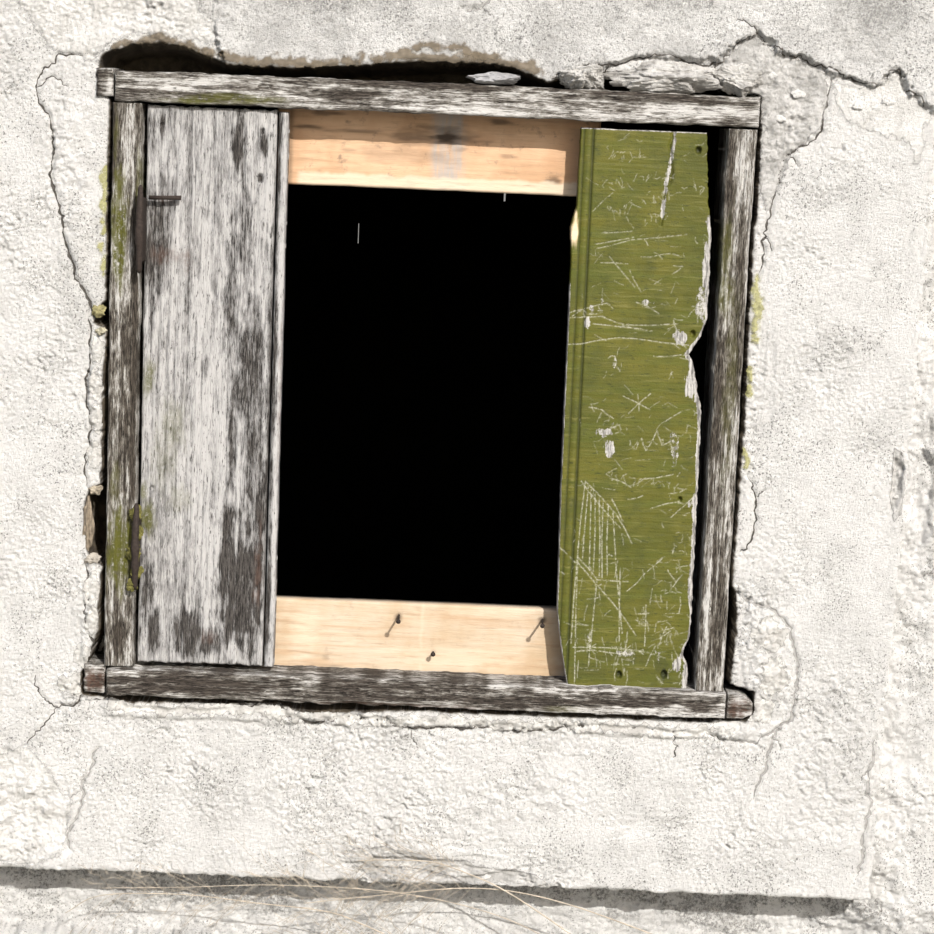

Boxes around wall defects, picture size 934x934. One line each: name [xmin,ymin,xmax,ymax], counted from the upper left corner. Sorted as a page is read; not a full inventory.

crack [35,53,109,480]
crack [582,19,925,275]